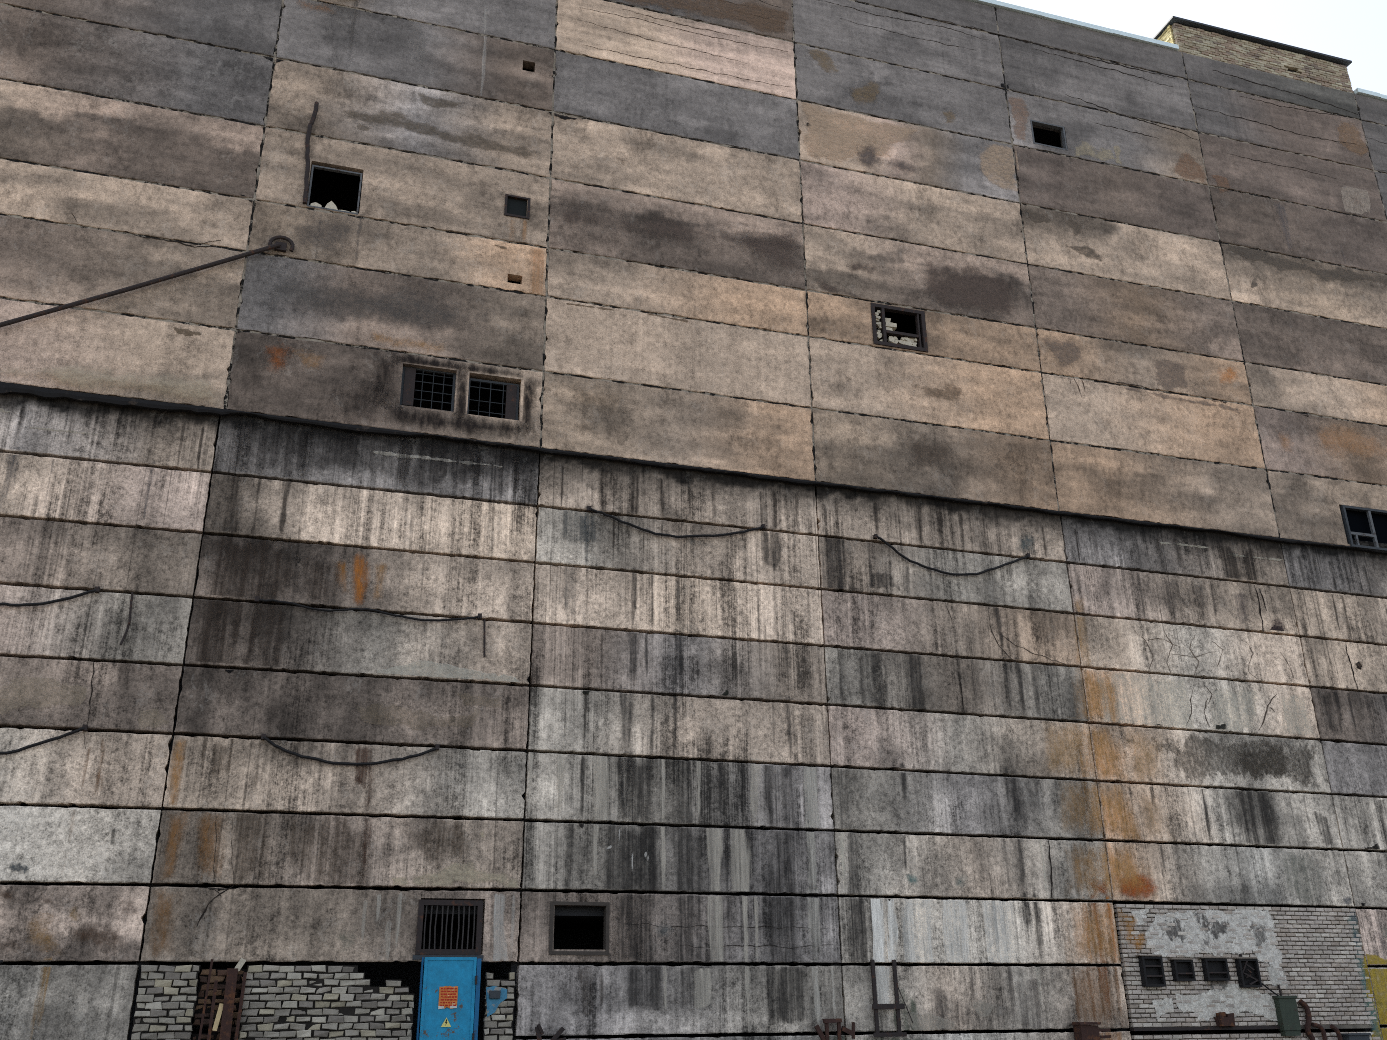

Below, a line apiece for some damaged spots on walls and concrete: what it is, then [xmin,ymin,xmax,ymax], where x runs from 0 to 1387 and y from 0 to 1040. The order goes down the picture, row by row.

water stain [764,499,780,565]
water stain [630,569,653,667]
crack [1135,585,1294,730]
water stain [1103,676,1313,844]
water stain [572,693,835,1025]
corrosion [1092,876,1154,953]
peeling [1131,908,1288,1021]